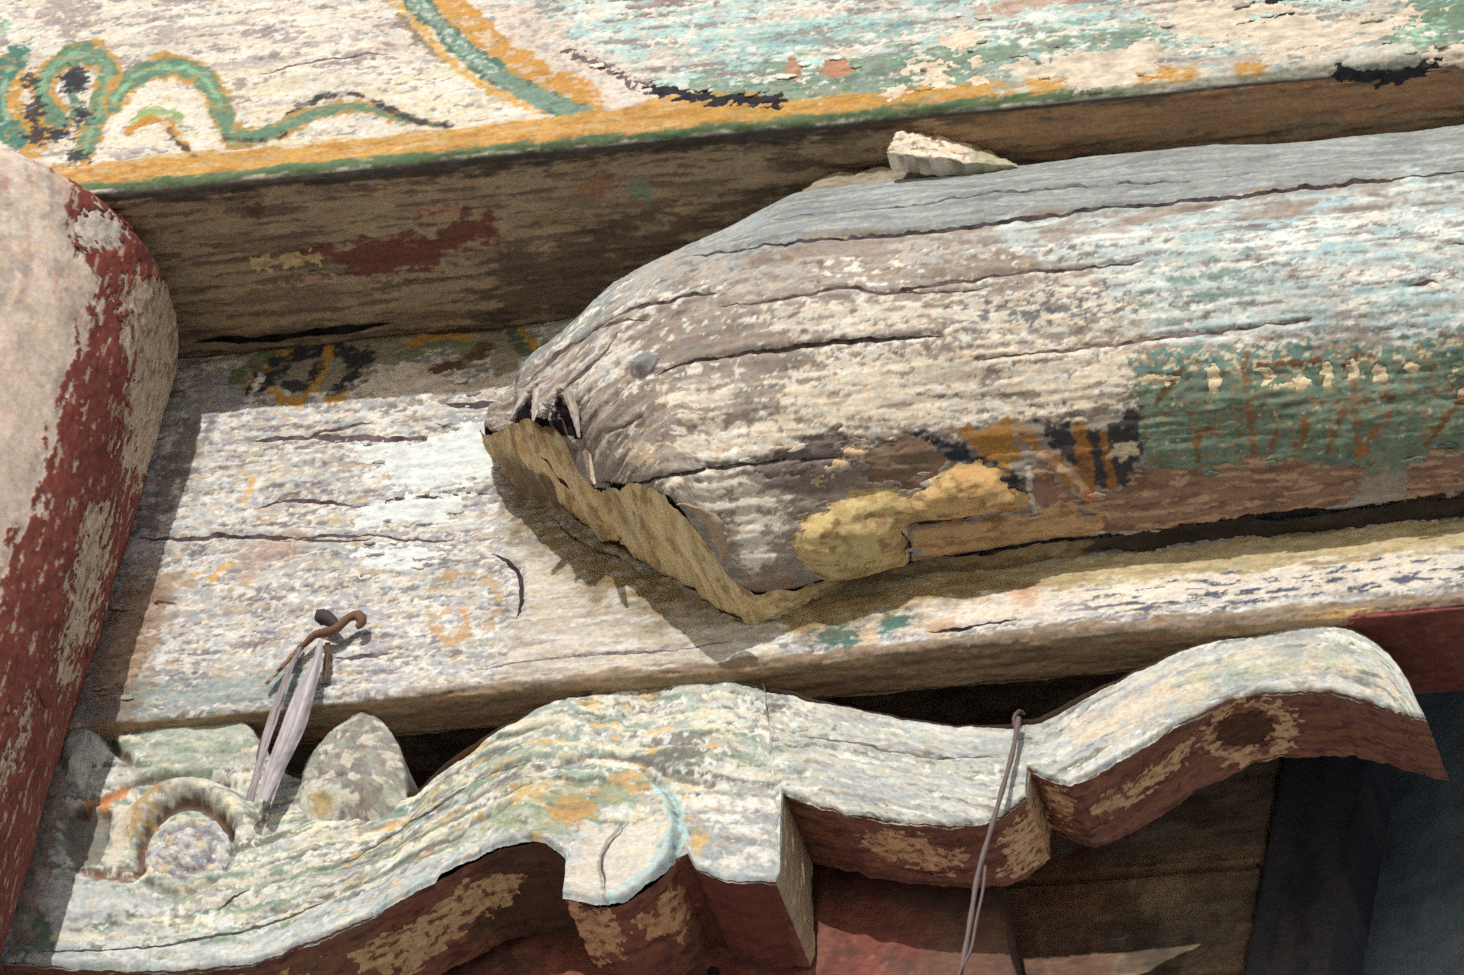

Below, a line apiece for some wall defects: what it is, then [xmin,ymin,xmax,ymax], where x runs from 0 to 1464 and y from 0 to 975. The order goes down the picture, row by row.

peeling [877,0,1464,102]
peeling [71,202,134,259]
crack [692,171,1464,257]
crack [444,260,1143,409]
crack [978,319,1311,360]
peeling [47,262,179,703]
crack [141,492,492,542]
crack [476,457,841,670]
peeling [739,423,1375,581]
crack [601,823,628,893]
peeling [346,872,527,975]
peeling [566,879,699,968]